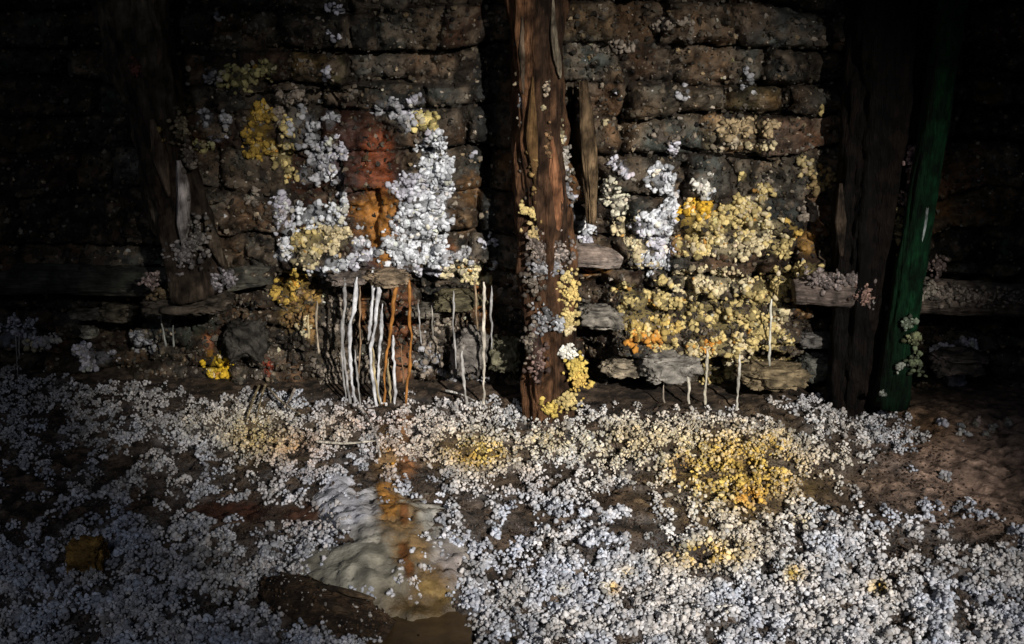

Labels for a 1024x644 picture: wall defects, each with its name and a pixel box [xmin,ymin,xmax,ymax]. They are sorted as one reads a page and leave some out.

rust [333,106,398,269]